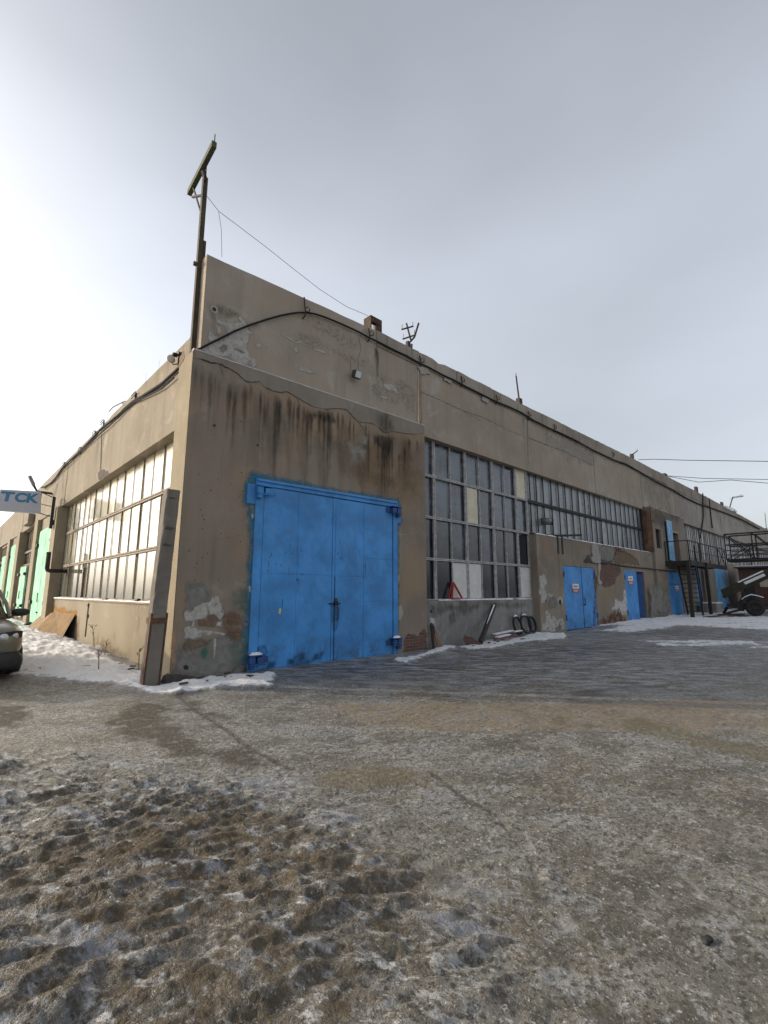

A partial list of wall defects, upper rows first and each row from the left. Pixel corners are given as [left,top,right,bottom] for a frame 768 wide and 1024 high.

crack [202,359,411,434]
flaking render [194,317,424,434]
flaking render [175,553,247,679]
flaking render [403,618,436,652]
flaking render [539,573,565,633]
flaking render [583,545,639,624]